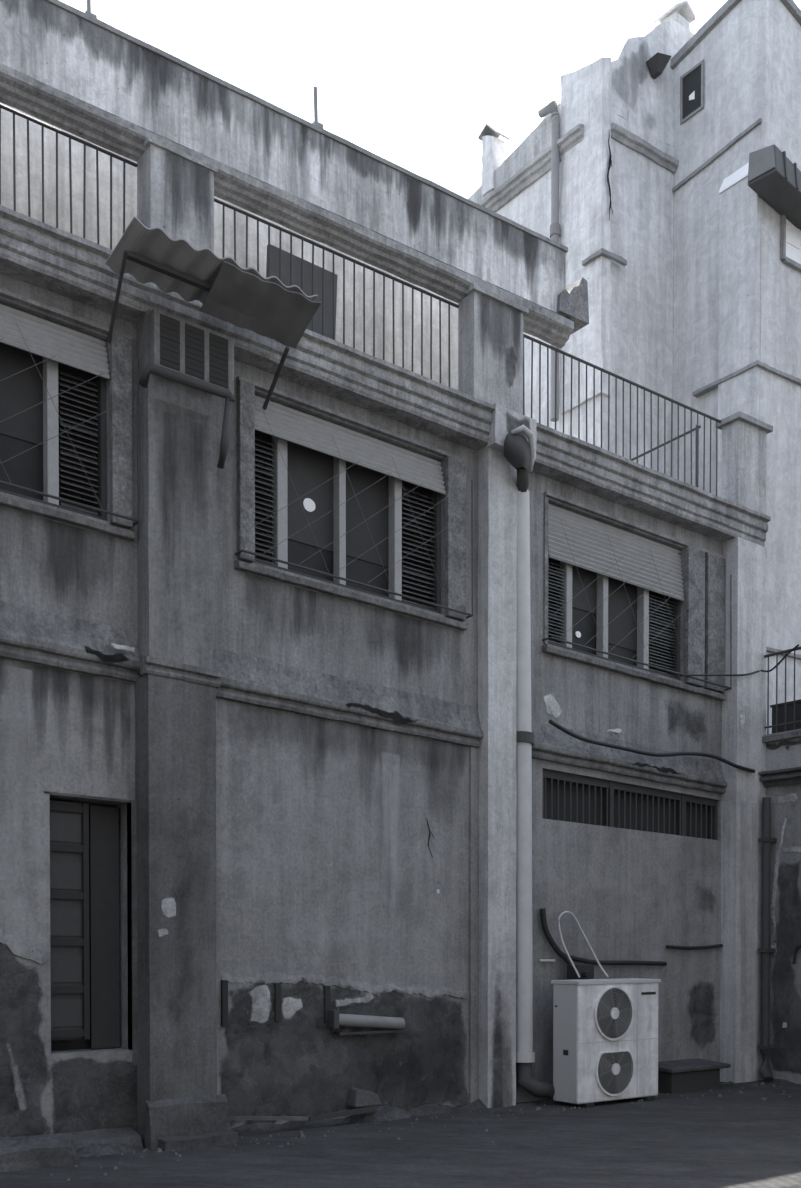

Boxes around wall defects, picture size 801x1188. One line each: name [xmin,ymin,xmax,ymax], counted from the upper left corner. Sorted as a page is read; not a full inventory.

water stain [50,4,112,58]
water stain [300,124,313,153]
water stain [357,151,379,177]
water stain [406,175,439,224]
crack [606,132,614,220]
spalling [0,929,137,1137]
spalling [221,971,469,1126]